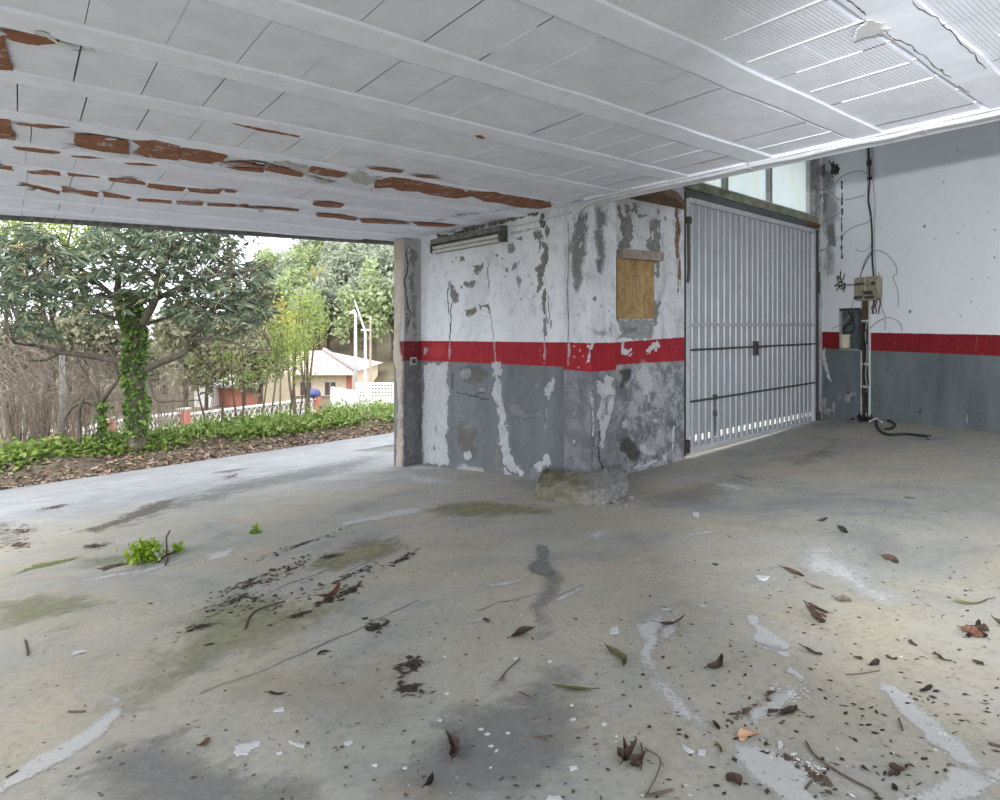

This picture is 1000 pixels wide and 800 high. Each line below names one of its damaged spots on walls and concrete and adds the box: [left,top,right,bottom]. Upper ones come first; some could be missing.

peeling [0,28,96,71]
peeling [0,119,556,364]
peeling [617,202,681,280]
peeling [593,296,662,356]
peeling [421,342,451,467]
flaking render [491,342,555,476]
leakage [487,545,583,607]
leakage [421,686,567,783]